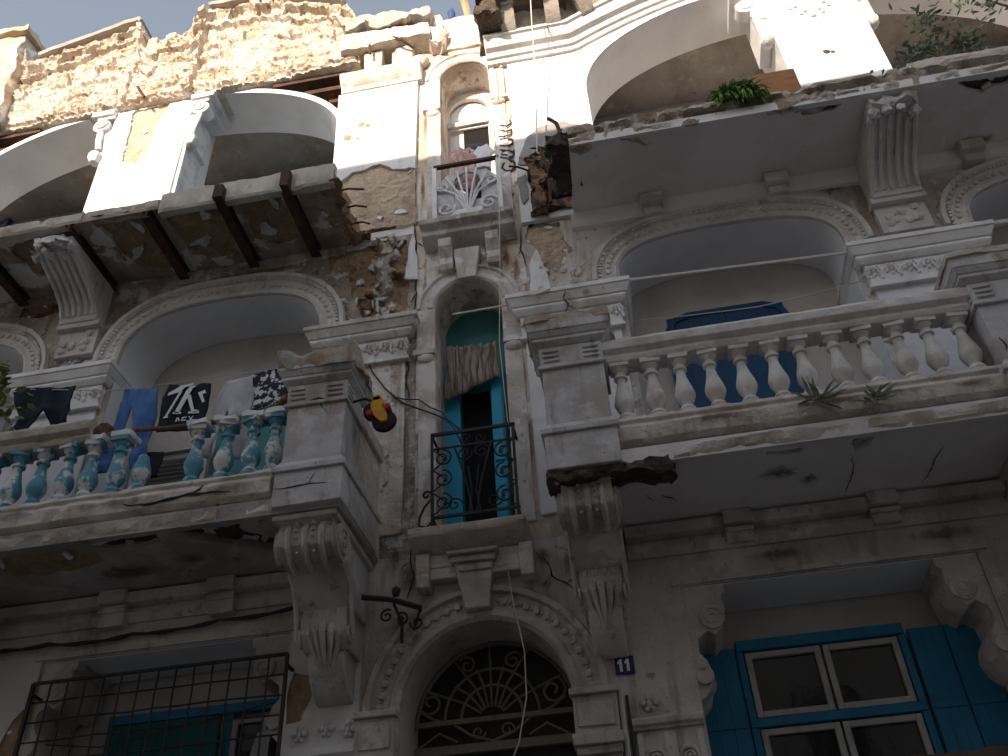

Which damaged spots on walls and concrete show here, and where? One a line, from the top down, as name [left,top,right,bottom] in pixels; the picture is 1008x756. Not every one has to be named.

spalling [959,75,1008,89]
flaking render [123,105,169,164]
spalling [11,237,45,274]
spalling [95,211,172,269]
spalling [167,208,238,258]
spalling [240,197,302,244]
flaking render [325,166,417,318]
spalling [509,117,584,277]
crack [122,486,231,507]
spalling [546,454,678,497]
crack [536,552,573,588]